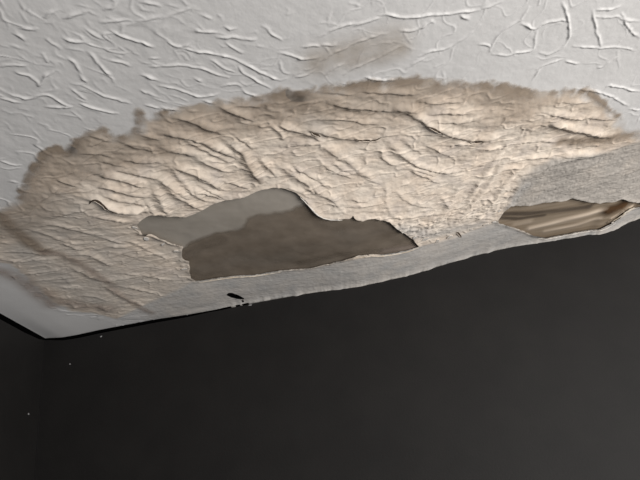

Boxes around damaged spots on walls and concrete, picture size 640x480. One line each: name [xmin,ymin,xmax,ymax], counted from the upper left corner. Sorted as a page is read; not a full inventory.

peeling [132,188,453,283]
peeling [483,198,640,240]